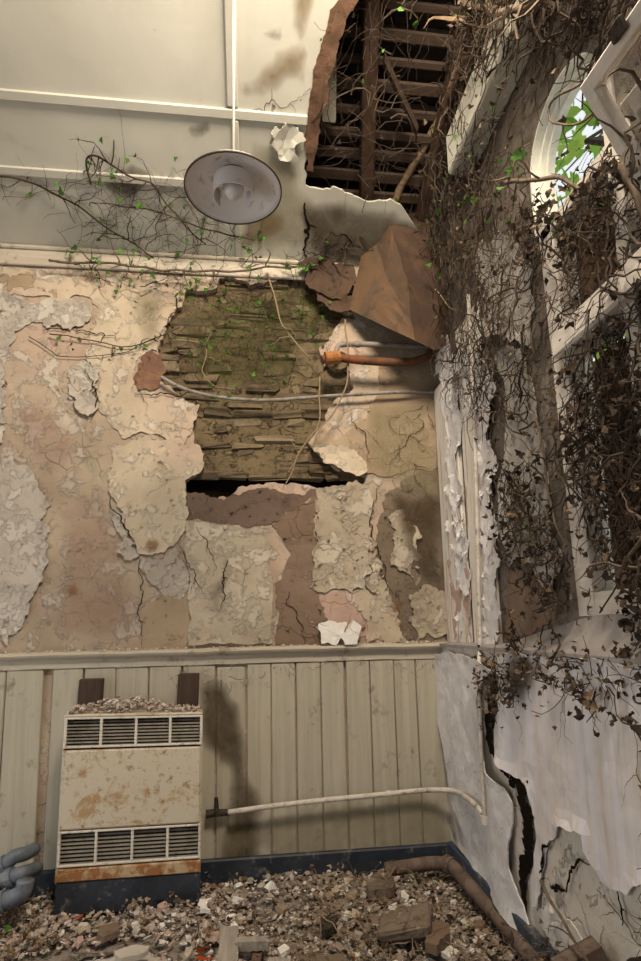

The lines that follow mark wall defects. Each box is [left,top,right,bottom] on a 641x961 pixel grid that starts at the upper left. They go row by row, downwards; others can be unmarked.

spalling [270,0,358,172]
crack [109,497,144,645]
spalling [0,231,641,927]
crack [484,672,589,916]
crack [622,733,641,805]
crack [600,884,641,946]